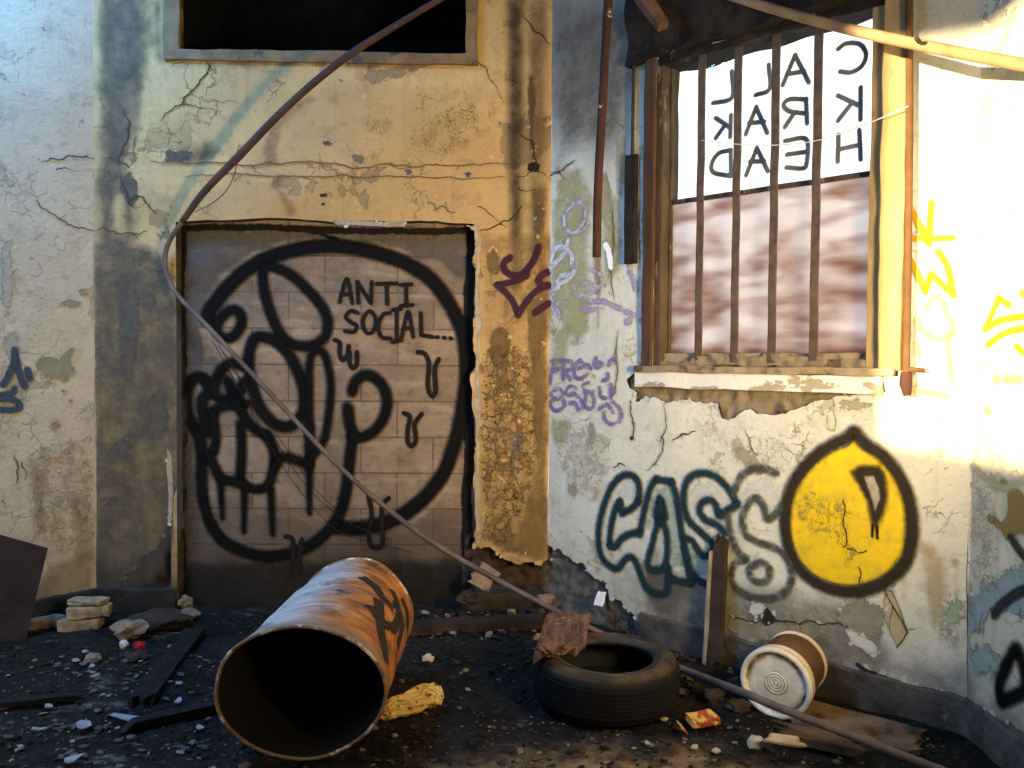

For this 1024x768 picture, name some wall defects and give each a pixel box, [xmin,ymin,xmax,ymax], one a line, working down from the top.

damp [98,0,146,234]
crack [161,61,216,121]
peeling [121,171,139,206]
crack [36,104,575,385]
peeling [35,347,76,405]
flaking render [461,225,639,636]
crack [481,330,696,546]
flaking render [629,375,873,432]
crack [181,422,189,592]
crack [727,614,850,632]
peeling [729,588,908,658]
peeling [938,561,1024,686]